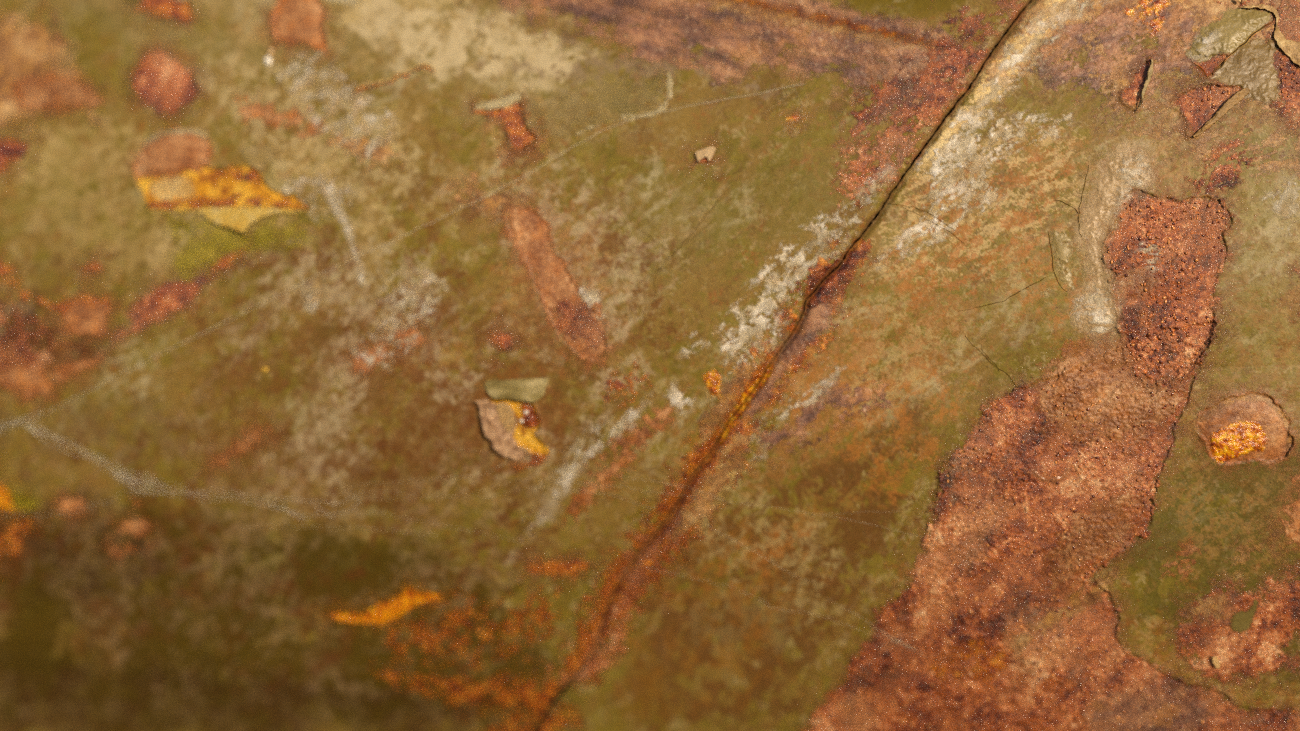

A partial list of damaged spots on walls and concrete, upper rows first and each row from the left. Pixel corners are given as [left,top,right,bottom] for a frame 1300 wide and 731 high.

corrosion [0,244,250,405]
corrosion [130,46,203,118]
peeling [133,126,308,233]
peeling [474,378,549,468]
corrosion [330,238,891,719]
crack [531,0,1035,731]
efflorescence [681,171,889,373]
damp [779,380,830,420]
corrosion [498,0,1300,731]
efflorescence [876,0,1094,269]
crack [961,165,1089,388]
peeling [1186,0,1300,137]